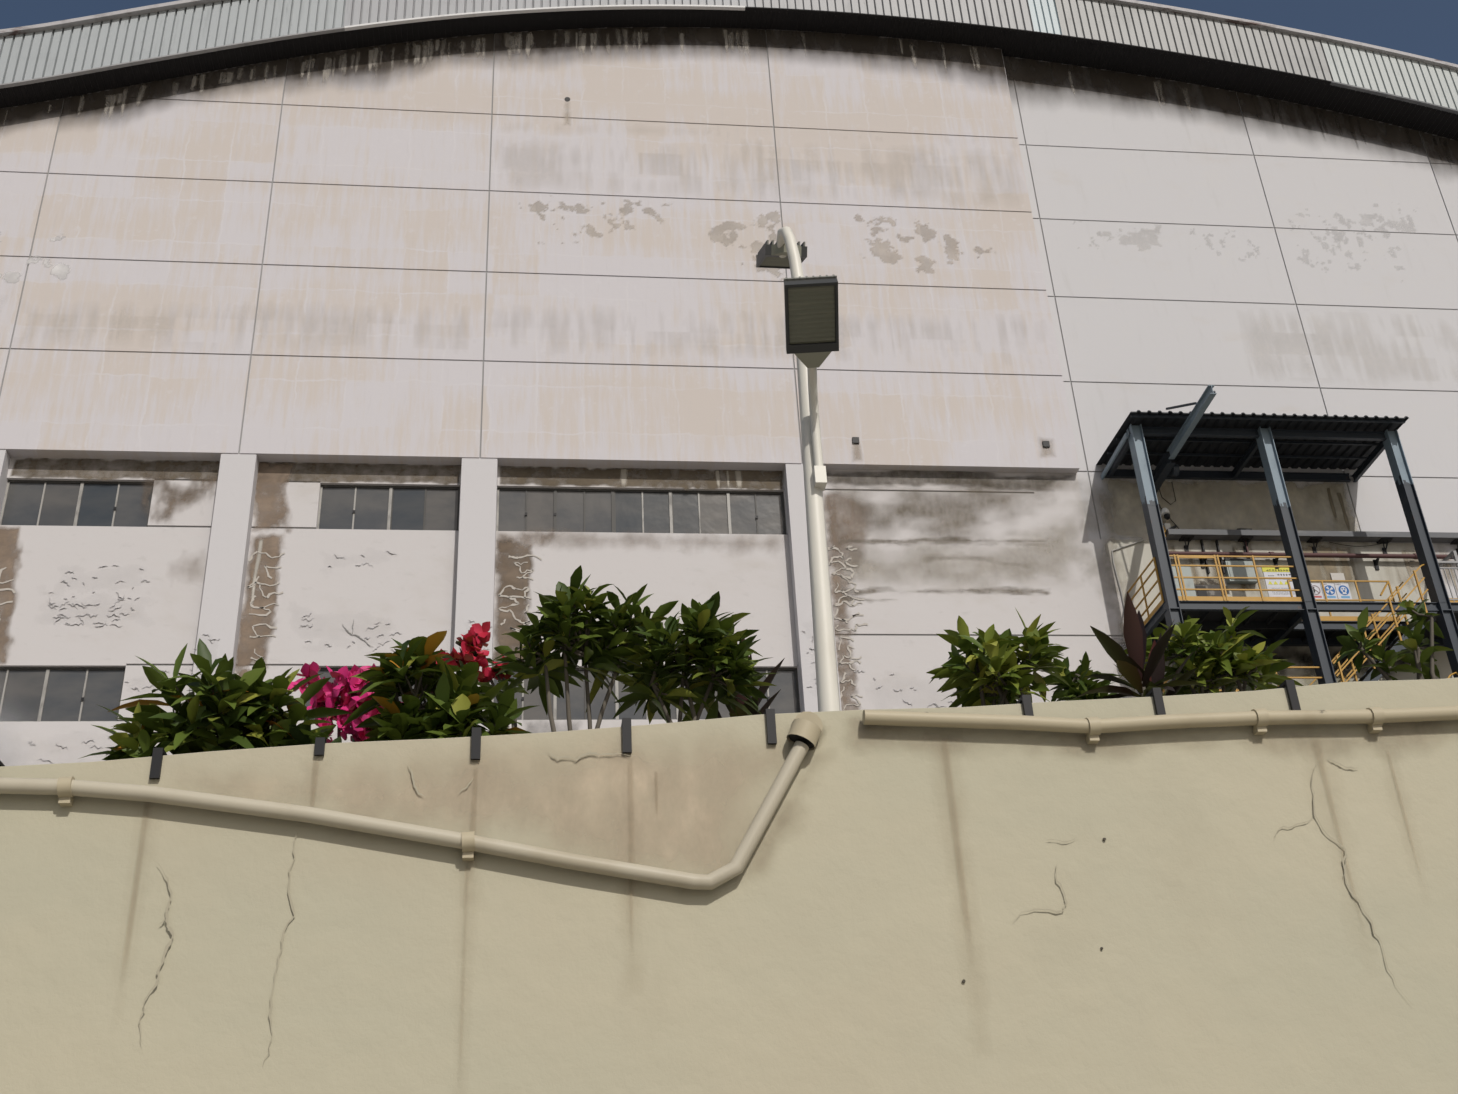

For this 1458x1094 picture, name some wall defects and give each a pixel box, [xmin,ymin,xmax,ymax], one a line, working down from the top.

water stain [0,27,1458,167]
peeling [531,202,662,236]
peeling [858,217,958,273]
crack [0,567,16,605]
crack [237,551,285,675]
crack [498,555,542,632]
water stain [826,470,1052,711]